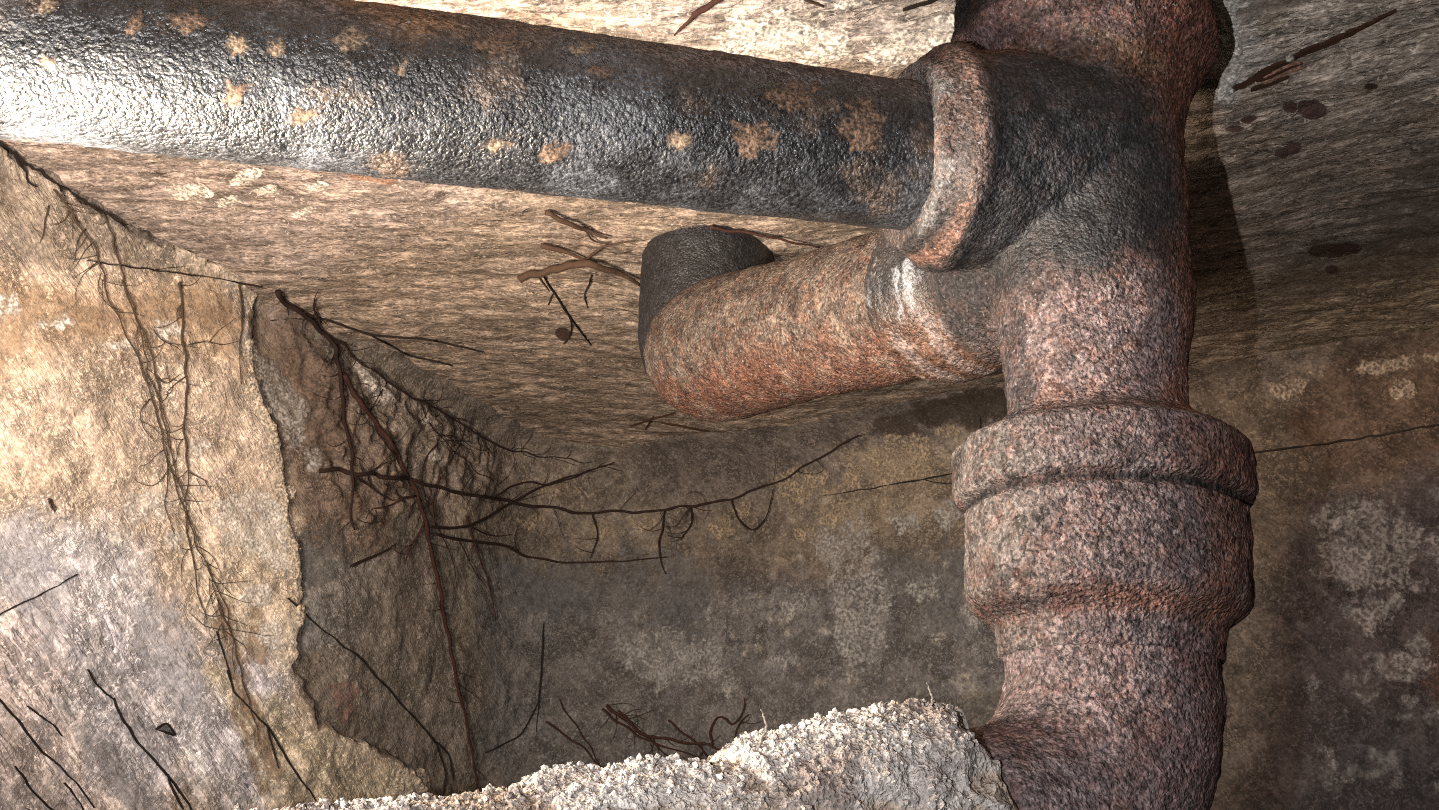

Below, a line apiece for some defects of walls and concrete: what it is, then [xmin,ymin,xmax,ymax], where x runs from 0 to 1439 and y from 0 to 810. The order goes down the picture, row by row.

crack [0,142,129,226]
rust [1226,115,1258,132]
rust [1274,143,1301,159]
rust [1283,100,1326,120]
rust [1308,243,1361,274]
crack [87,260,484,366]
crack [543,274,592,346]
crack [0,574,78,615]
crack [0,699,95,810]
crack [87,669,192,810]
crack [216,631,317,802]
crack [287,598,454,796]